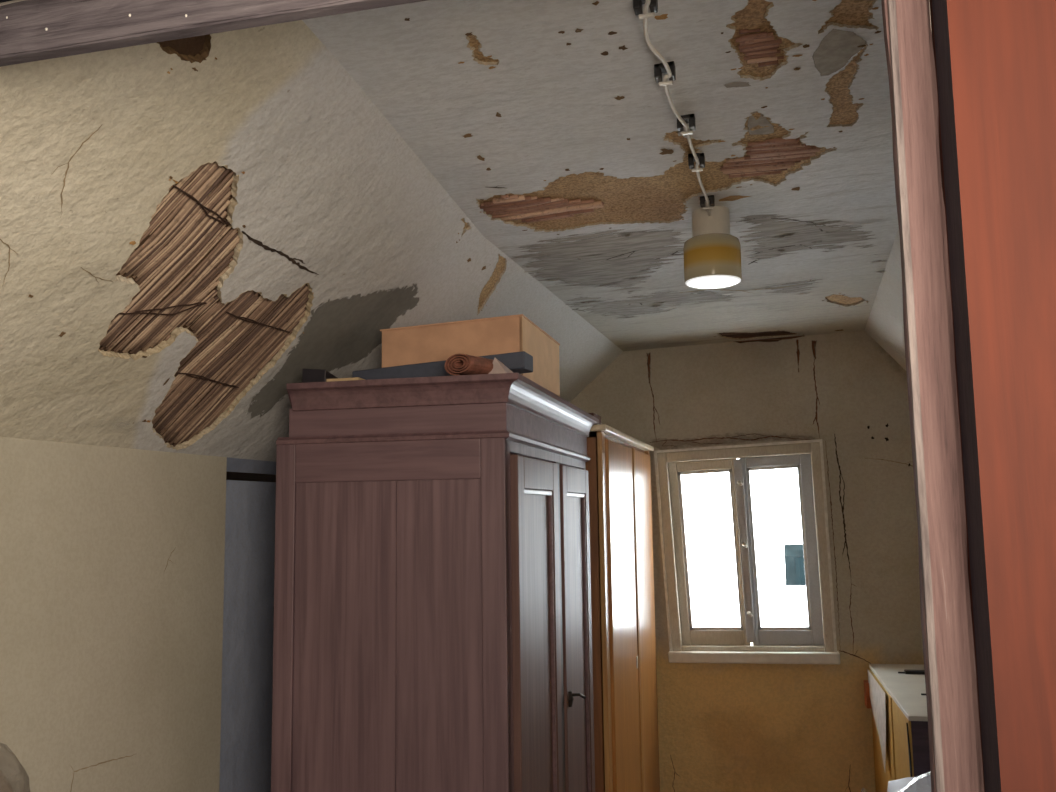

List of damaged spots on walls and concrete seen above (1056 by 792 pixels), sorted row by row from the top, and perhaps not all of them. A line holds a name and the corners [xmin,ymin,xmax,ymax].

flaking render [156,34,217,74]
flaking render [458,32,499,69]
flaking render [721,0,881,132]
crack [52,124,103,218]
flaking render [98,161,314,450]
crack [241,231,319,275]
flaking render [476,106,837,318]
flaking render [822,293,869,306]
crack [649,359,871,664]